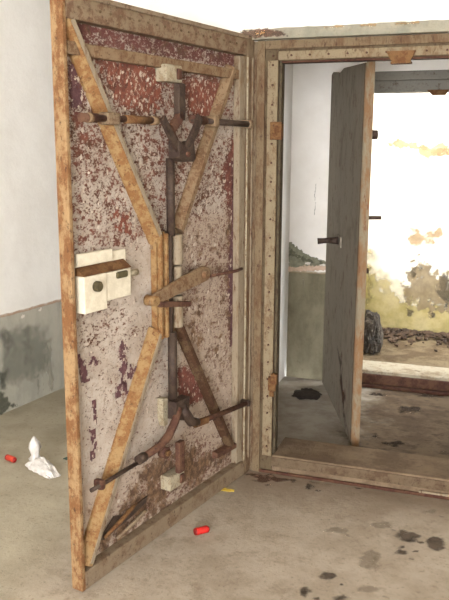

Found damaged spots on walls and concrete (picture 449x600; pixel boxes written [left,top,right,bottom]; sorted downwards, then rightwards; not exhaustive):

peeling [69,64,85,109]
peeling [93,59,165,117]
peeling [182,75,219,128]
peeling [113,188,146,250]
leakage [0,327,53,415]
peeling [78,351,100,463]